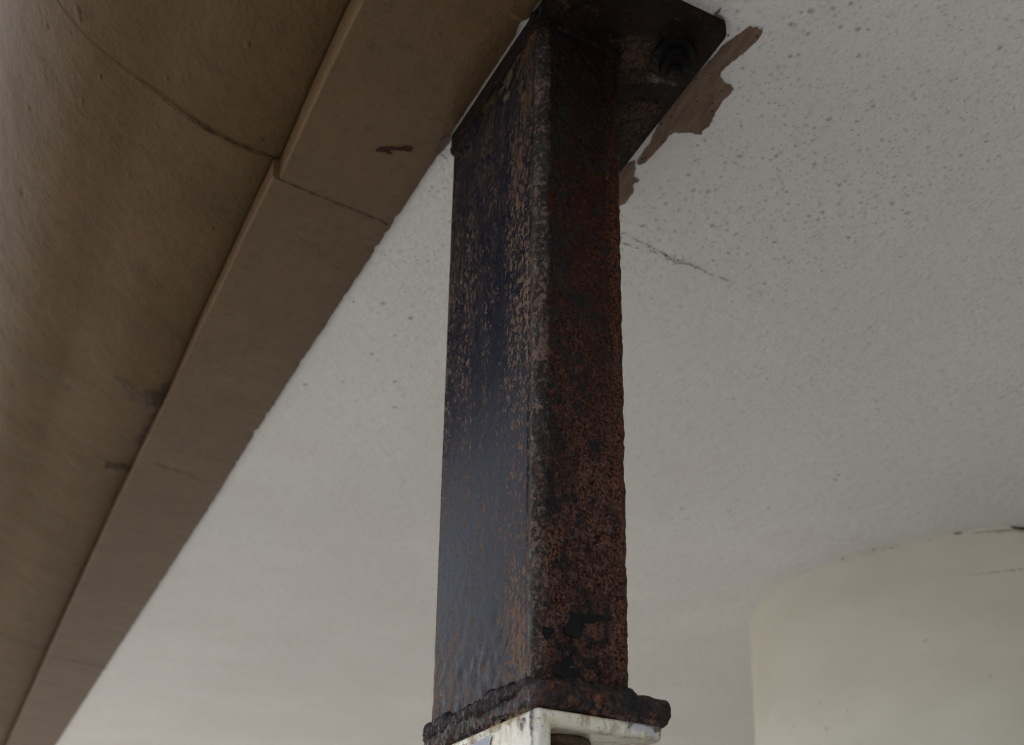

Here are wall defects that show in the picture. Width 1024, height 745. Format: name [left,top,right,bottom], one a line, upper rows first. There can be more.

crack [621,232,769,294]
corrosion [463,709,533,745]
corrosion [605,714,661,732]